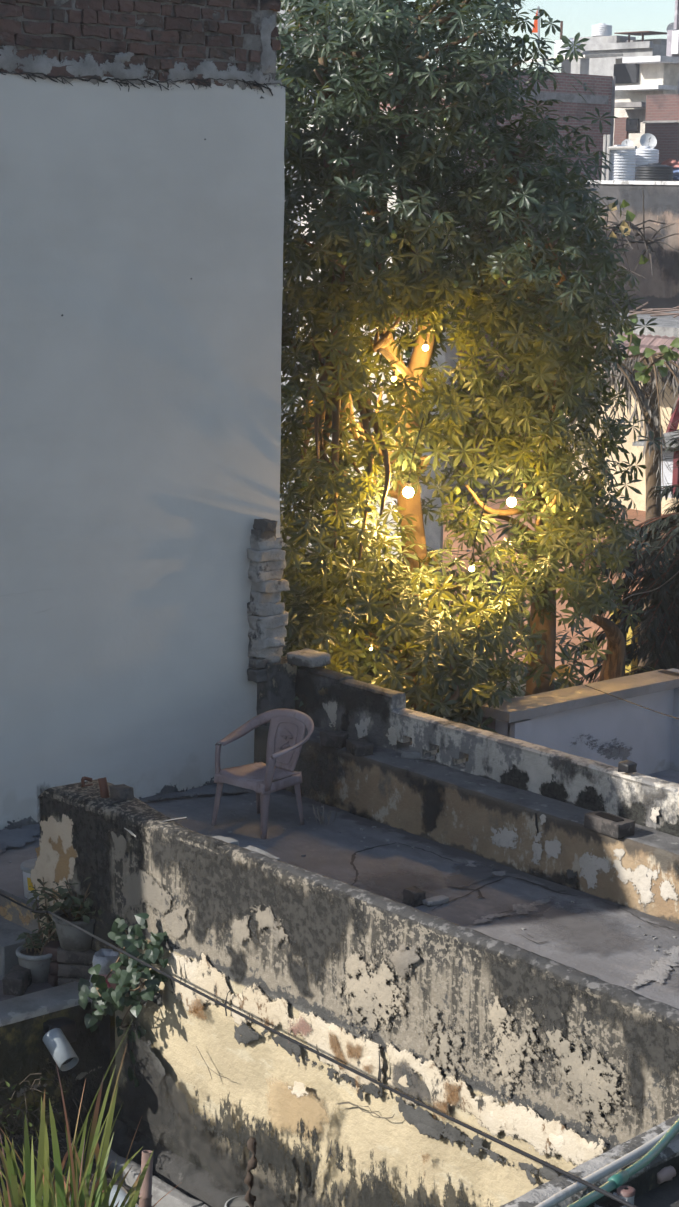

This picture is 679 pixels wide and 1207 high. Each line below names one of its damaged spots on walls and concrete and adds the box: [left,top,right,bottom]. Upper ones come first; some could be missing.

spalling [0,71,288,96]
leakage [622,186,679,285]
leakage [548,756,592,781]
peeling [30,814,78,910]
leakage [5,787,365,998]
crack [350,813,672,944]
leakage [530,903,631,953]
peeling [527,839,678,907]
peeling [626,807,679,831]
flaking render [111,831,632,1186]
leakage [480,950,679,1113]
leakage [80,1007,493,1207]